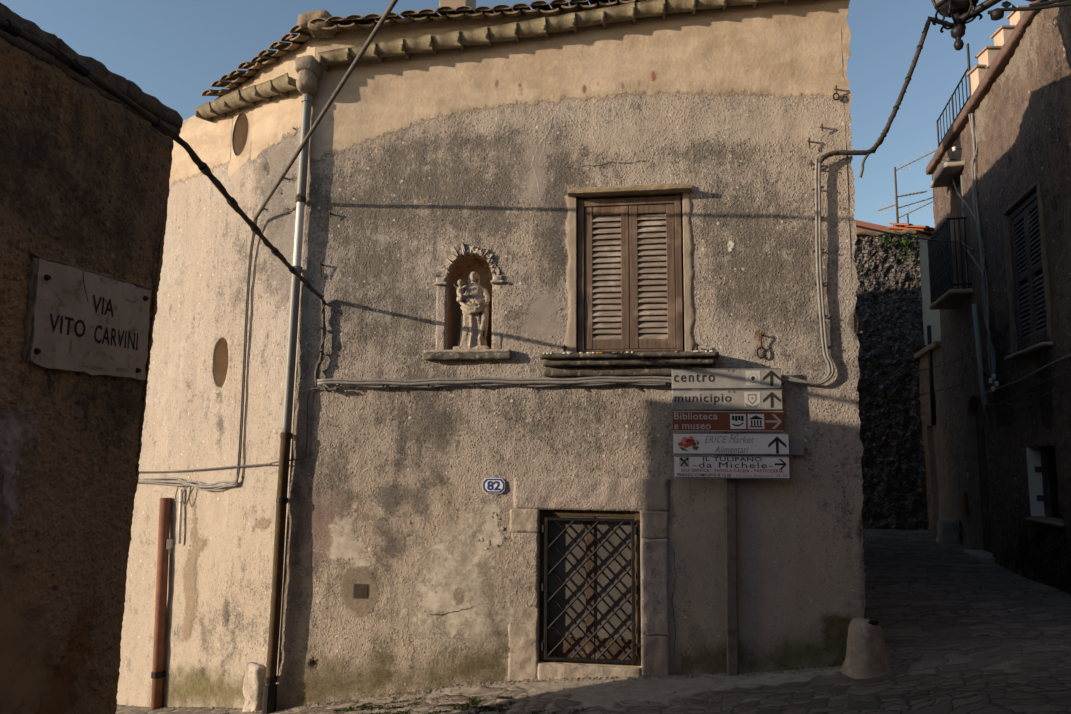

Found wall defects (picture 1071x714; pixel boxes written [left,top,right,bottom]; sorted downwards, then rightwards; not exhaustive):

peeling [515,135,555,211]
crack [531,117,648,196]